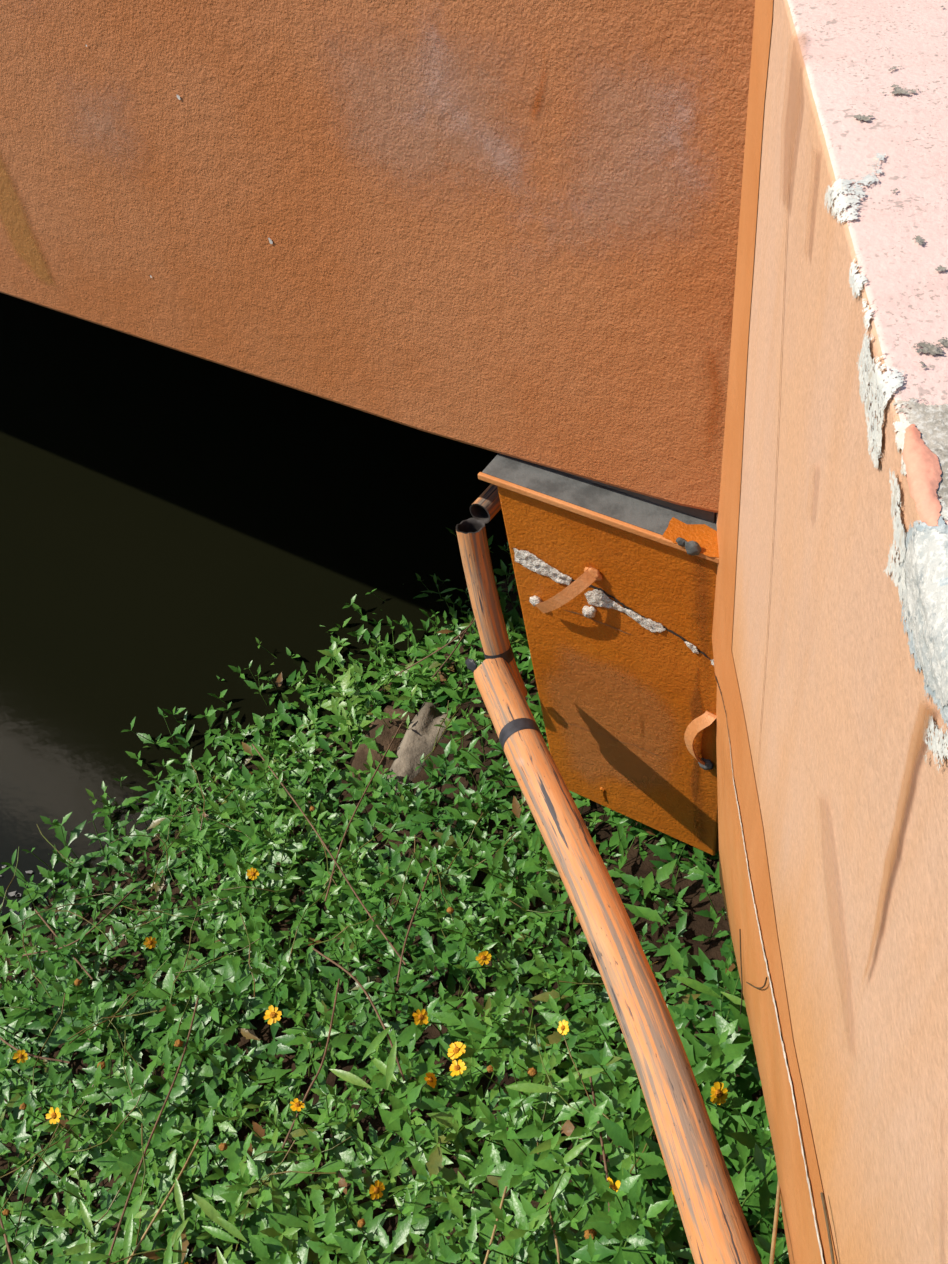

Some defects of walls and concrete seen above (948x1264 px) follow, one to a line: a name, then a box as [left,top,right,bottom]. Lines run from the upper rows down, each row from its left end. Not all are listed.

damp [354,56,506,164]
damp [584,86,669,226]
peeling [824,153,886,223]
peeling [879,66,919,95]
spalling [849,256,948,773]